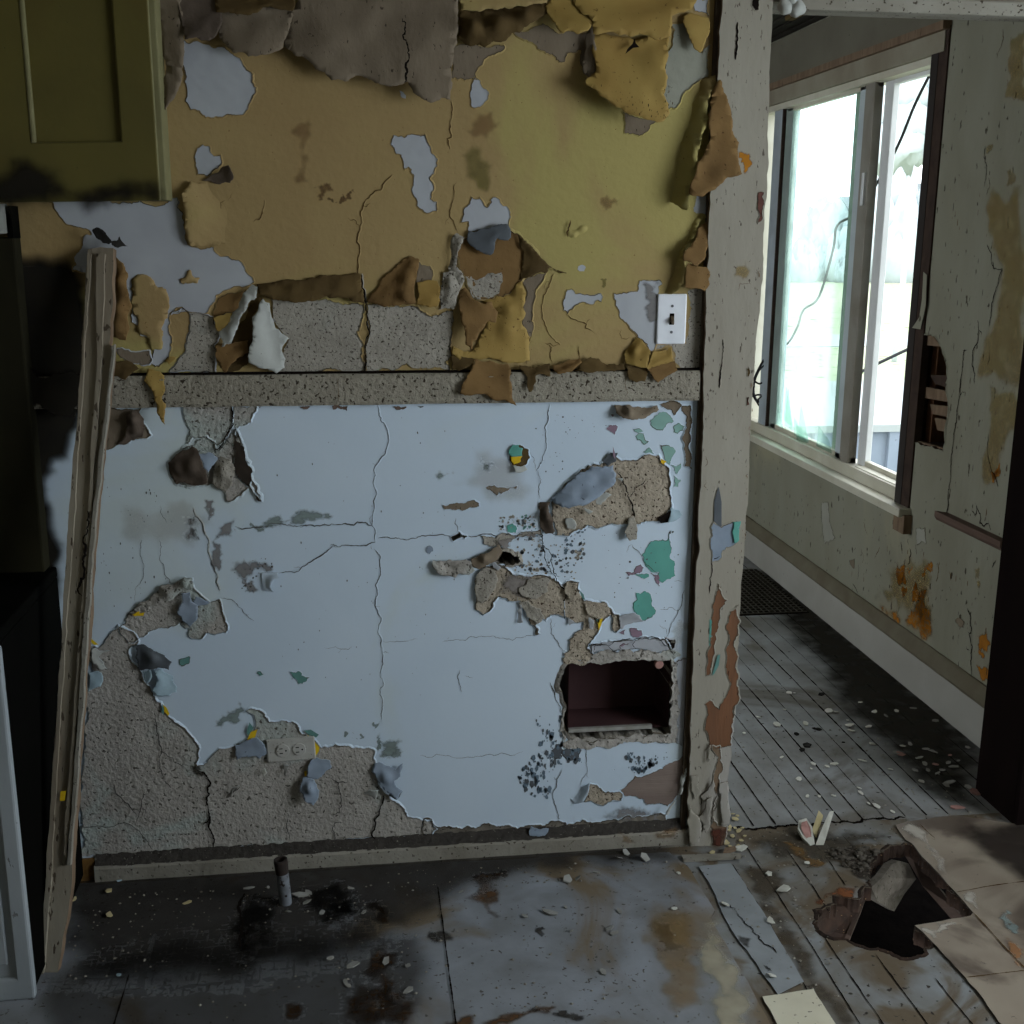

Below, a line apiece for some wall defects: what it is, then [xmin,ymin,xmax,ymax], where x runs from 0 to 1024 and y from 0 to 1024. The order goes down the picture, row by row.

peeling [182,38,258,119]
peeling [52,144,255,368]
peeling [561,279,702,368]
crack [618,473,646,517]
crack [235,404,567,719]
flaking render [473,514,687,746]
crack [589,546,720,655]
corrosion [881,562,933,639]
corrosion [977,633,990,681]
peeling [687,583,747,854]
crack [85,716,240,849]
crack [371,795,385,839]